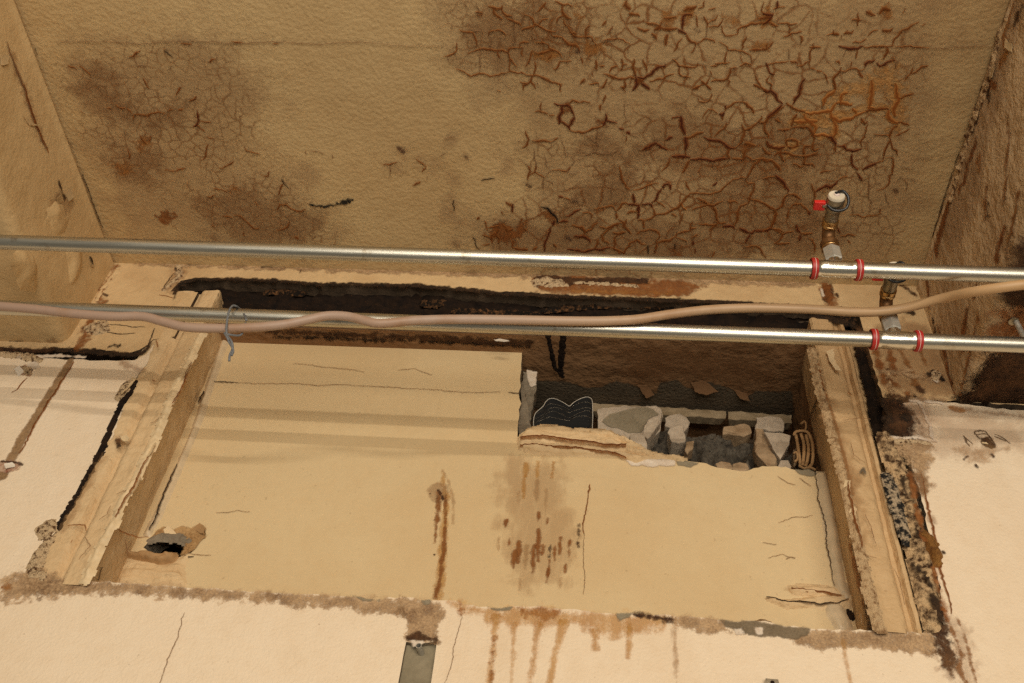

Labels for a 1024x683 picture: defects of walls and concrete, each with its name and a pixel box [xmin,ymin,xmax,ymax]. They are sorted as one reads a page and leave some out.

crack [65,0,976,259]
spalling [534,380,794,419]
peeling [0,320,445,647]
corrosion [430,478,448,598]
corrosion [508,512,580,578]
crack [582,484,591,593]
peeling [626,459,698,467]
spalling [672,347,952,657]
corrosion [458,600,674,654]
leakage [933,624,958,675]